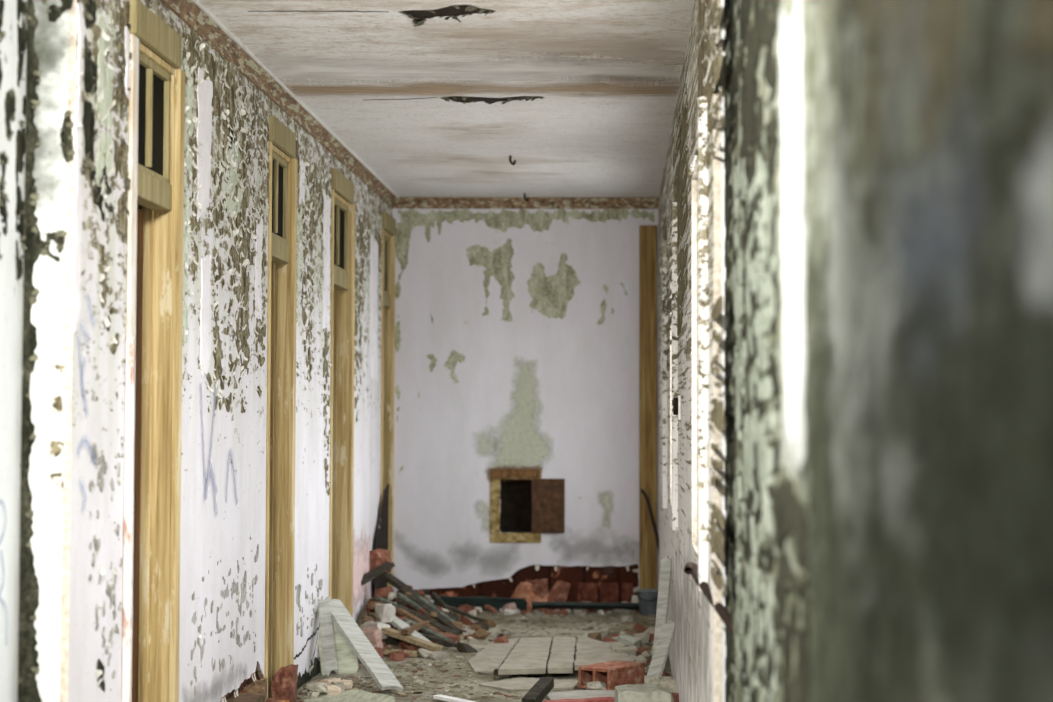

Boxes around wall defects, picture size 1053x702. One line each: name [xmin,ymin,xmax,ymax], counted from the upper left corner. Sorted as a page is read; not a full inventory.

peeling [0,0,132,702]
peeling [180,20,269,418]
peeling [295,128,332,496]
peeling [354,211,382,424]
peeling [831,168,893,405]
peeling [1023,133,1053,303]
peeling [188,535,259,696]
flaking render [220,669,264,702]
peeling [295,564,323,637]
flaking render [297,657,321,690]
flaking render [374,572,388,594]
flaking render [376,483,389,550]